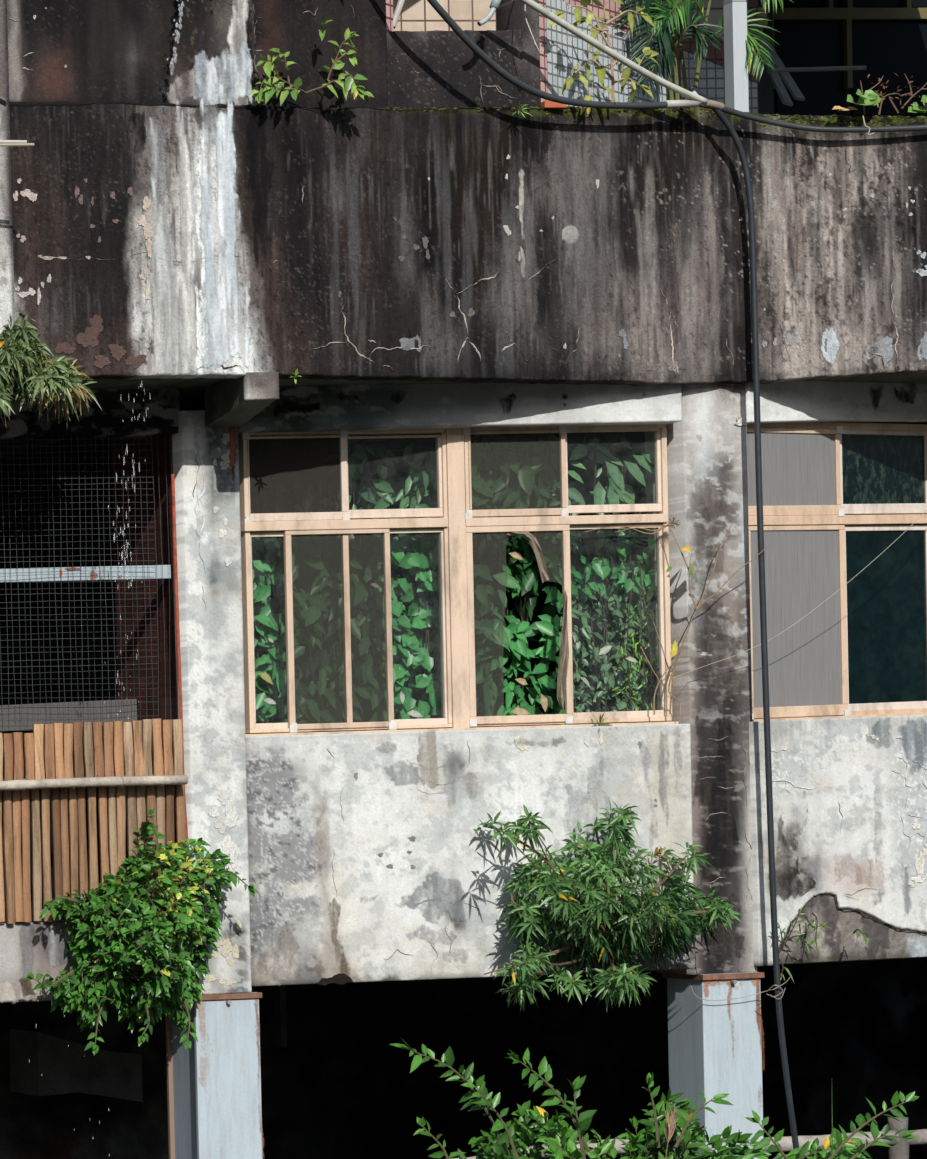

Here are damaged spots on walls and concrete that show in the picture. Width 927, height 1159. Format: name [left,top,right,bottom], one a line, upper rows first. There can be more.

peeling [13,178,38,202]
water stain [130,0,271,374]
water stain [516,170,530,295]
water stain [705,172,724,301]
peeling [15,274,52,305]
crack [315,306,430,370]
crack [445,272,527,361]
peeling [820,327,840,365]
water stain [695,606,740,879]
flaking render [779,893,927,964]
rust [704,980,731,1016]
rust [748,978,764,1048]